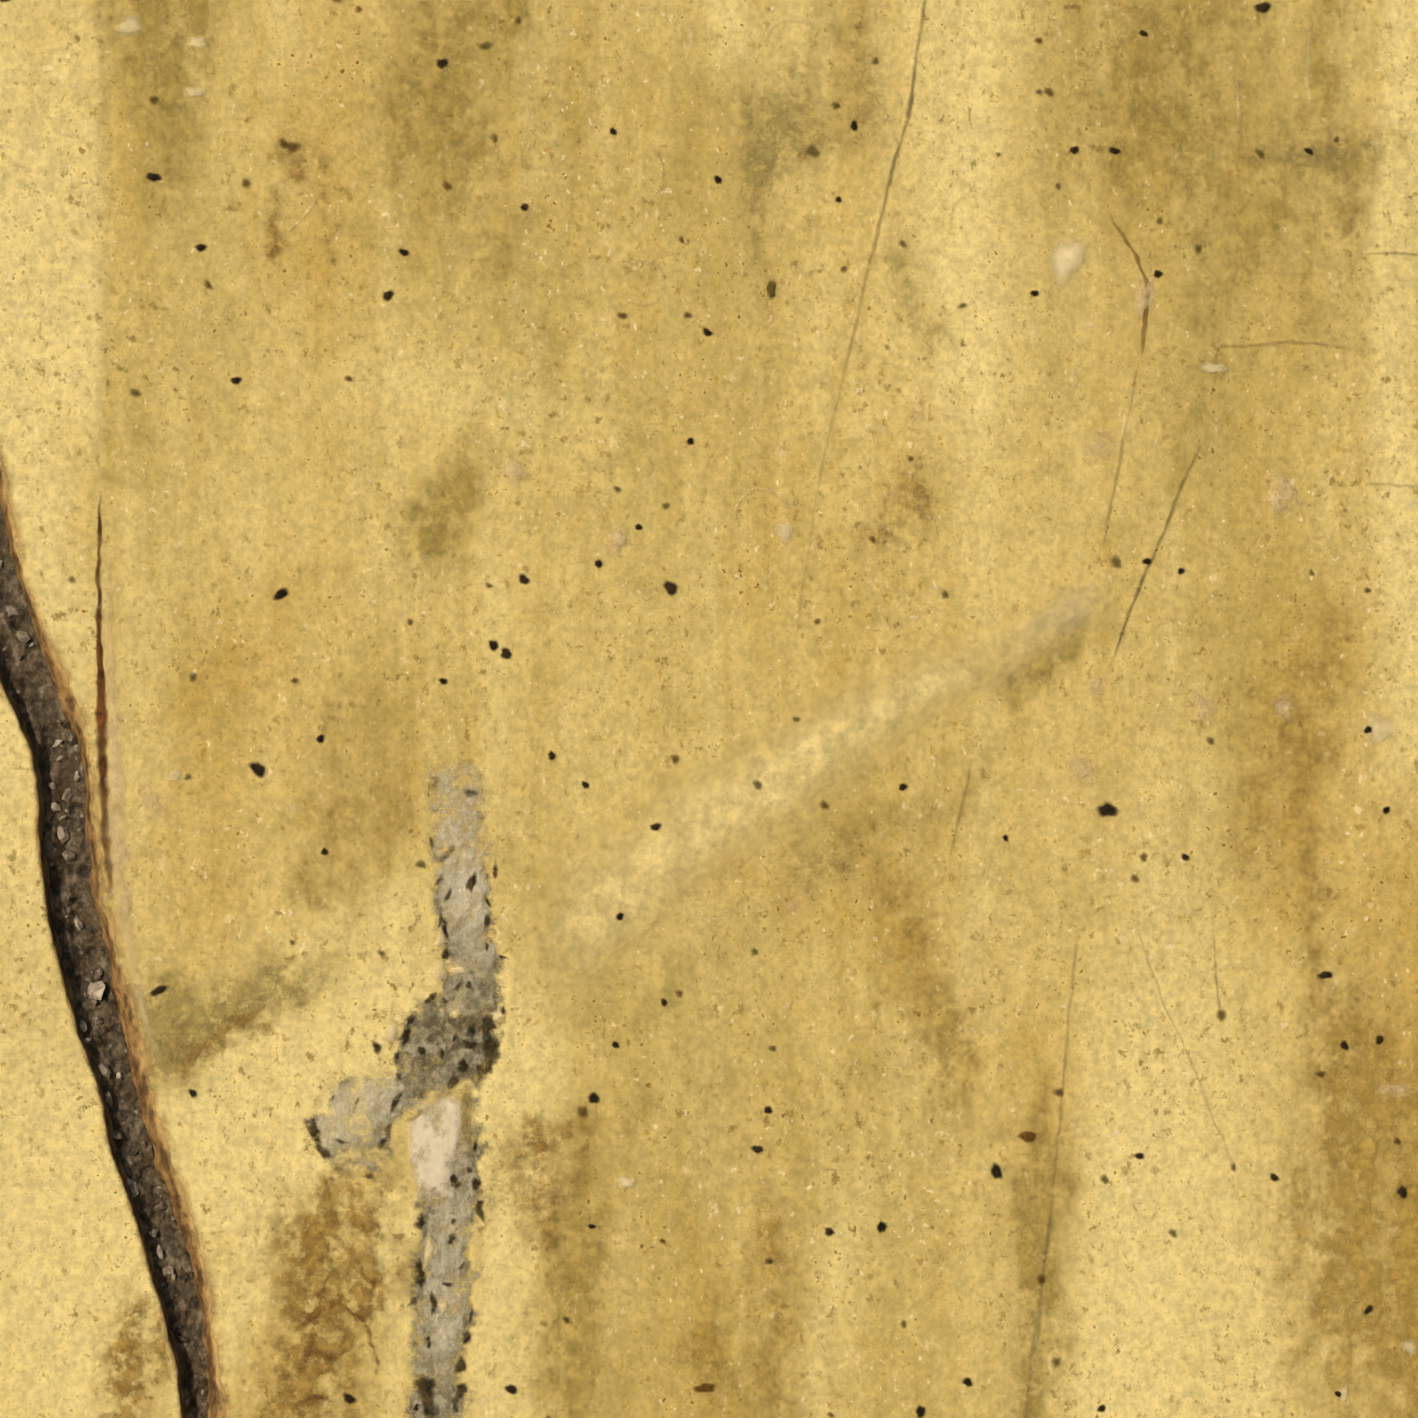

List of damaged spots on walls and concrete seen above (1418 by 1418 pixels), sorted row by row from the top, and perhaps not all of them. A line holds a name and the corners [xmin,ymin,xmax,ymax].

damp [137,0,209,174]
damp [405,8,488,162]
damp [1110,7,1213,159]
damp [409,467,474,556]
crack [0,453,230,1418]
peeling [303,767,506,1418]
damp [1292,1010,1418,1418]